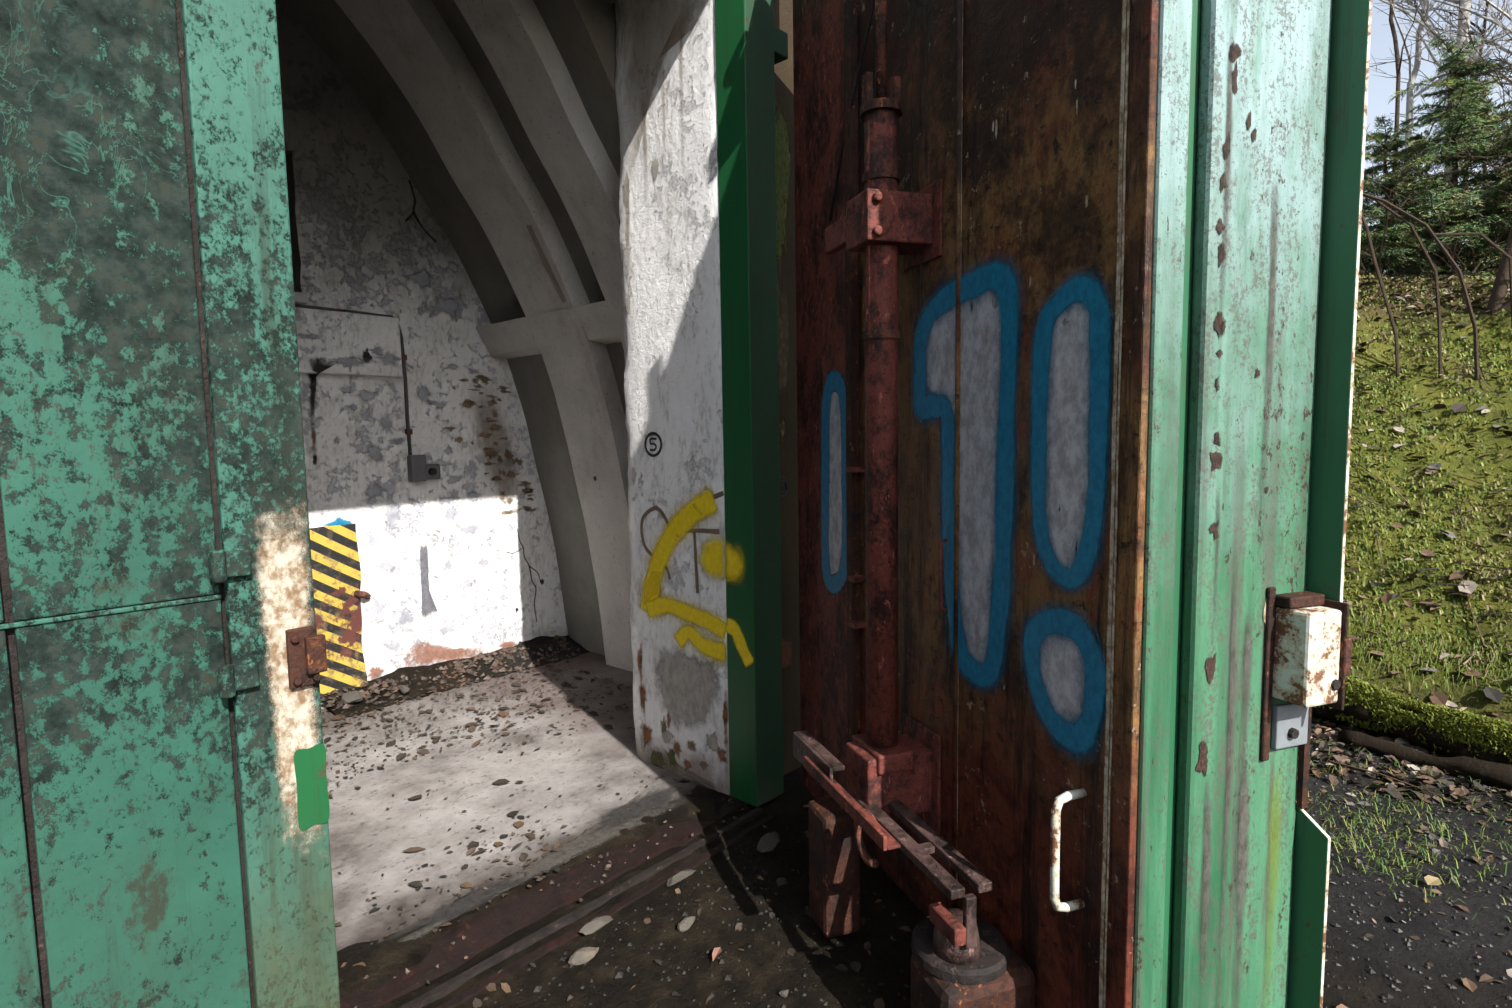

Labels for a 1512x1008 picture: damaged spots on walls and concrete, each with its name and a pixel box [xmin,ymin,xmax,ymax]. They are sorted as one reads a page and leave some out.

corrosion [1229,40,1242,94]
corrosion [1220,133,1230,193]
corrosion [1217,218,1226,268]
peeling [337,348,401,367]
corrosion [1214,311,1226,357]
peeling [368,417,403,460]
peeling [419,364,537,514]
corrosion [1210,431,1223,471]
peeling [258,516,318,834]